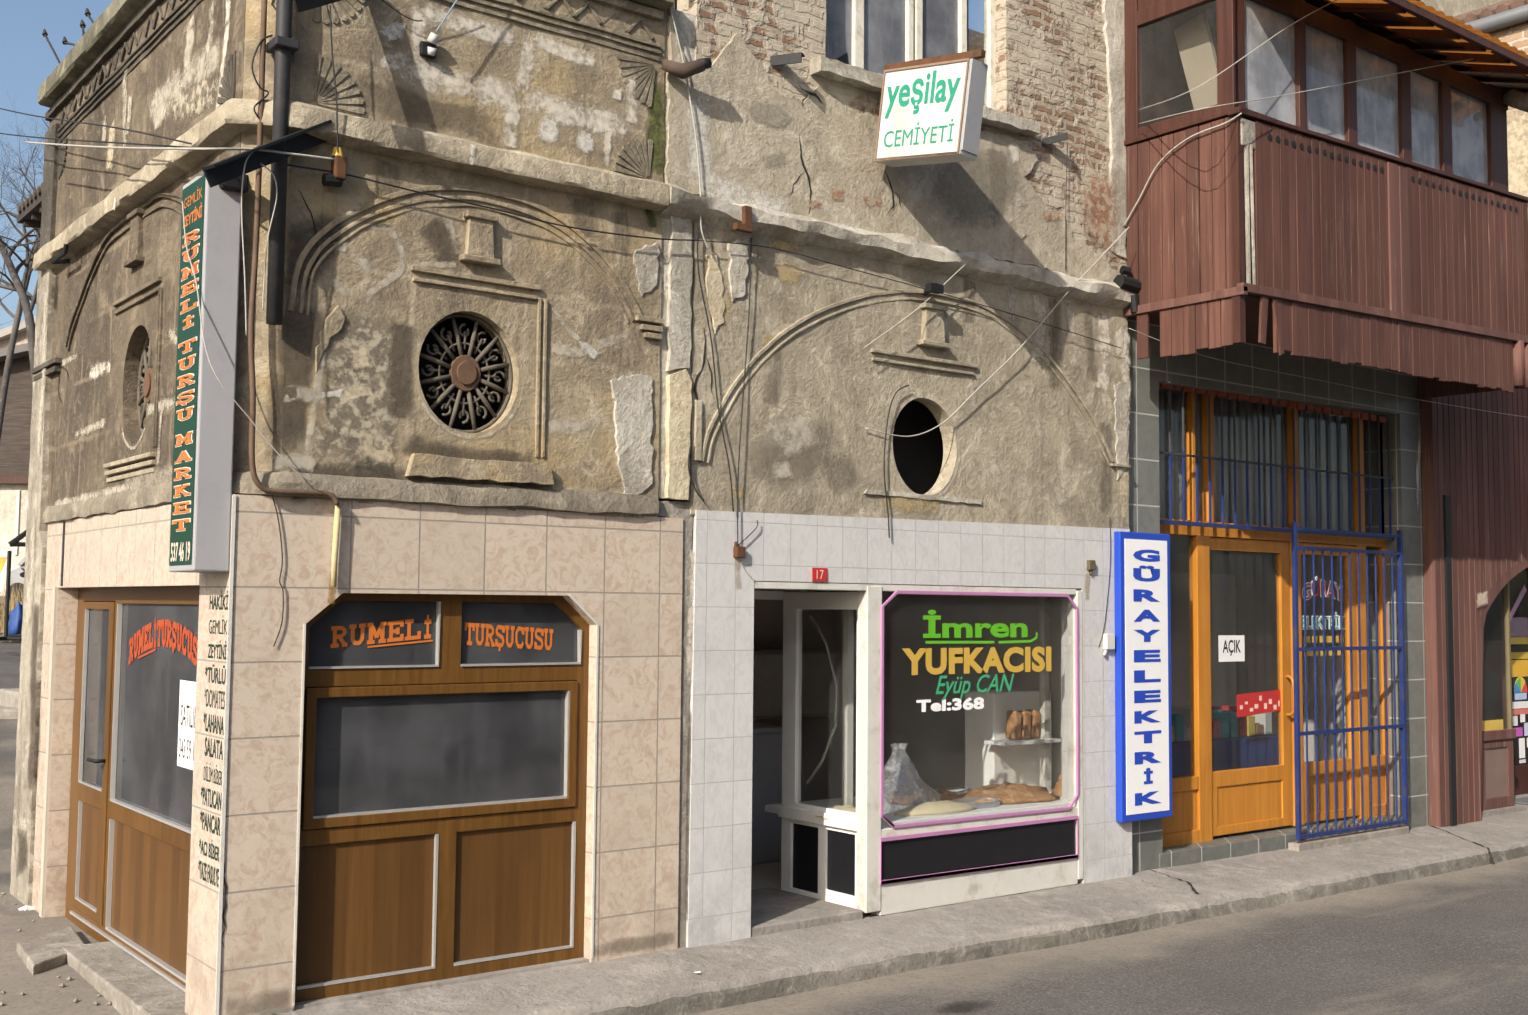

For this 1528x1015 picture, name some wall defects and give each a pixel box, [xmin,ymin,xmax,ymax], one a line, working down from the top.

spalling [170,75,215,119]
crack [789,85,822,214]
flaking render [1083,174,1119,248]
peeling [697,238,750,413]
peeling [611,374,654,495]